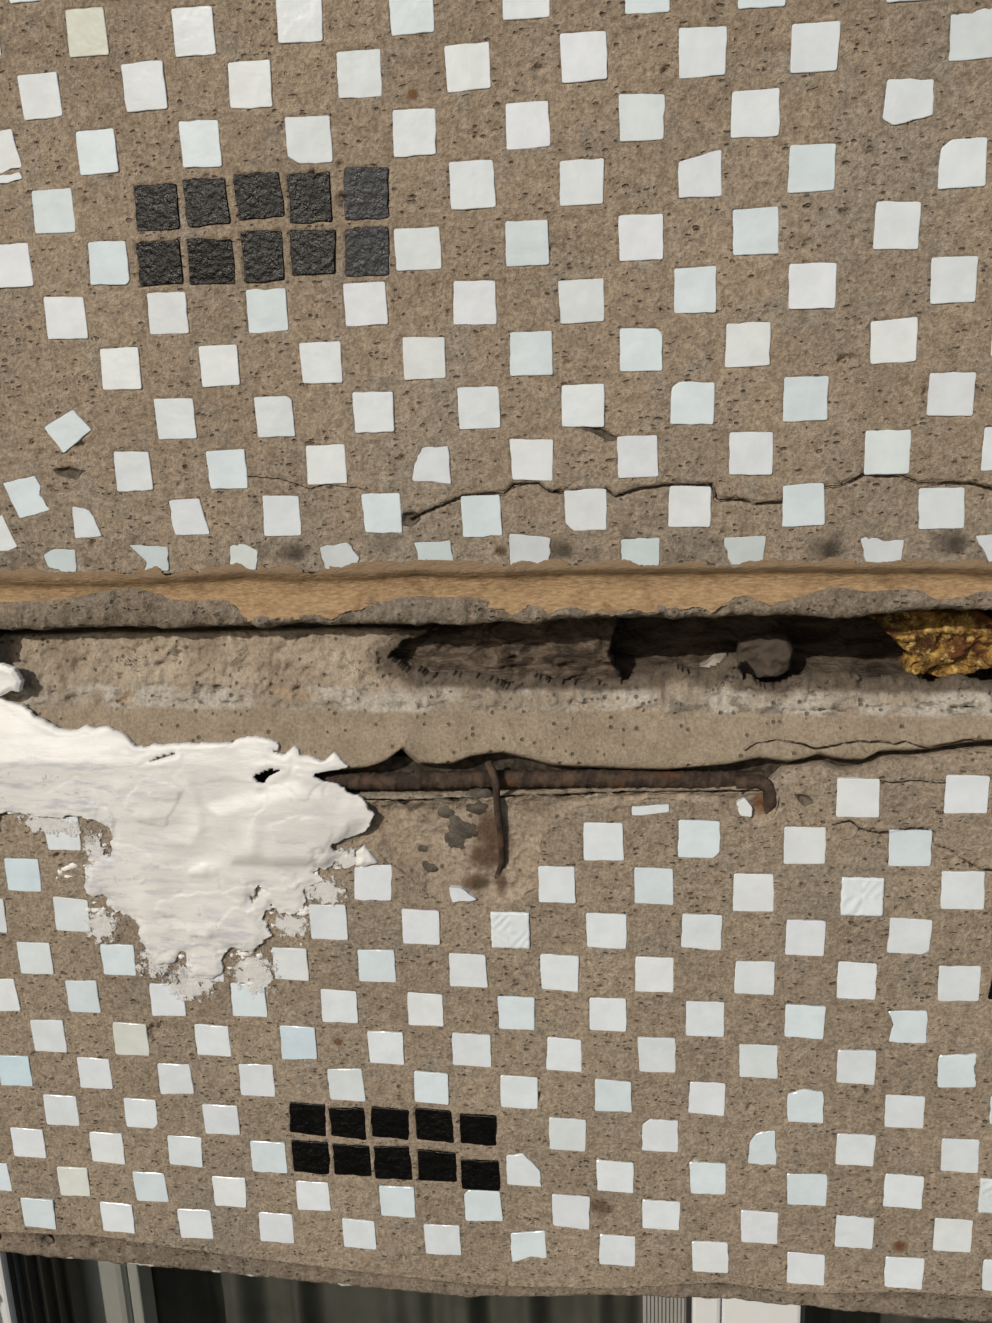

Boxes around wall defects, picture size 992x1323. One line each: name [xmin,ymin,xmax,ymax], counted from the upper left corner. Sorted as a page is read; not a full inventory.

spalling [45,410,91,480]
spalling [0,476,50,552]
spalling [44,506,102,572]
spalling [130,499,210,571]
spalling [509,534,551,565]
spalling [564,488,607,531]
crack [410,482,783,519]
crack [824,473,989,489]
spalling [0,587,992,685]
rust [465,815,504,891]
spalling [314,760,814,906]
crack [835,820,992,871]